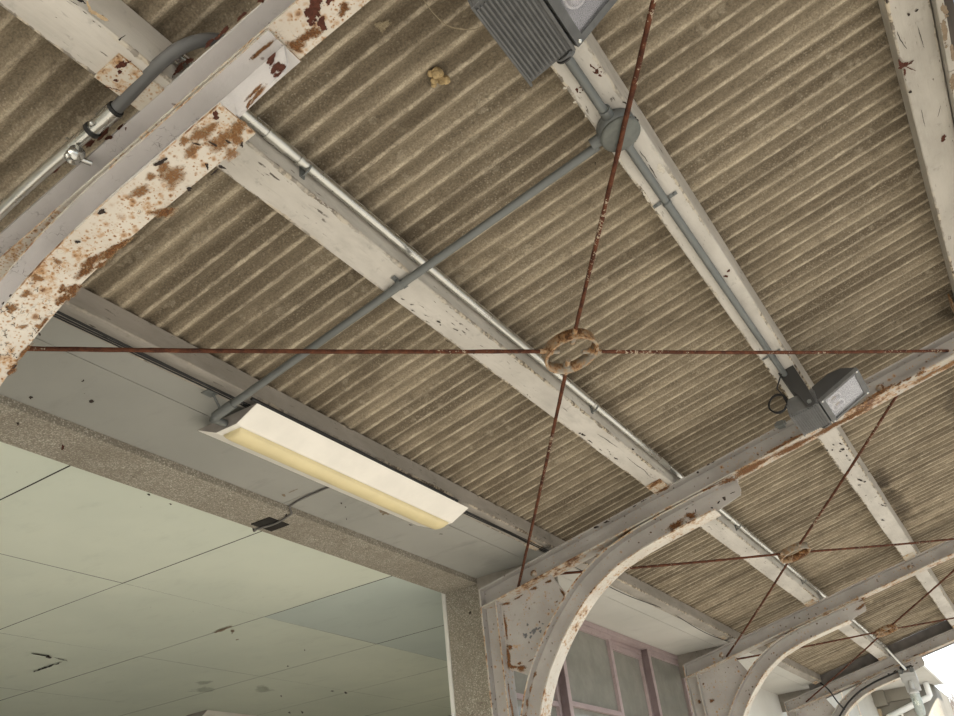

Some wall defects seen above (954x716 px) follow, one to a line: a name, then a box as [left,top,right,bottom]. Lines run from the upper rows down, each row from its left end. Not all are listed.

corrosion [251,27,324,60]
corrosion [245,82,265,109]
corrosion [129,122,246,198]
corrosion [149,208,176,218]
corrosion [55,239,132,306]
corrosion [7,291,31,314]
corrosion [7,345,31,377]